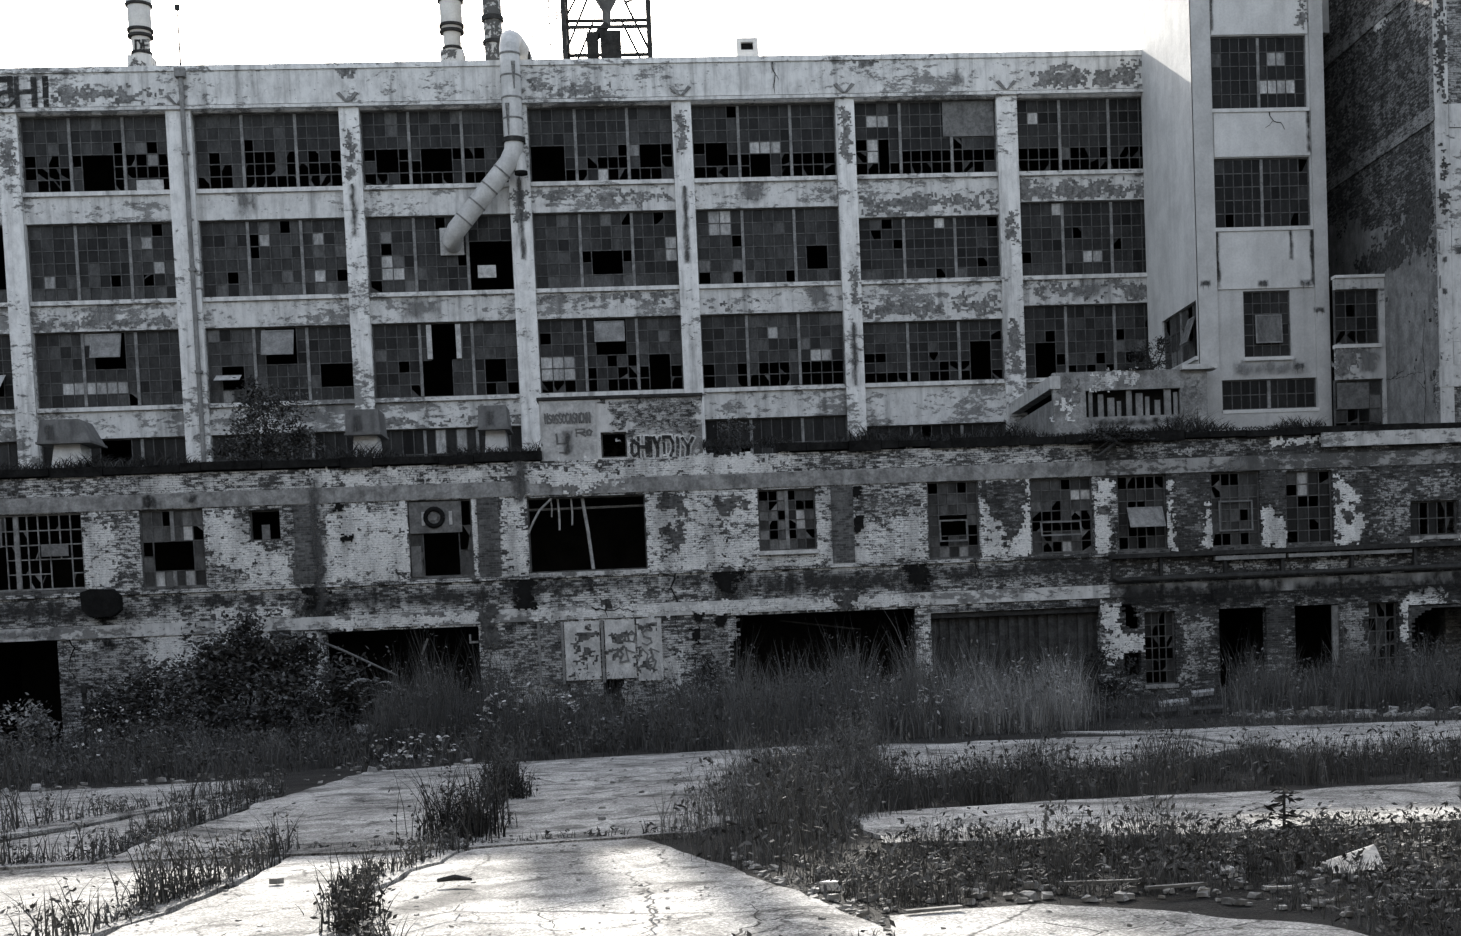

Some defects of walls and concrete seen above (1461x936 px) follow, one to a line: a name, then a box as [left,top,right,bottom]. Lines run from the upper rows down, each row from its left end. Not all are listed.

peeling [1294,0,1308,30]
peeling [852,60,879,69]
peeling [1373,0,1449,104]
peeling [51,83,165,108]
peeling [527,79,611,99]
peeling [835,106,855,163]
spalling [1354,143,1452,274]
peeling [1330,341,1368,379]
peeling [0,392,1461,716]